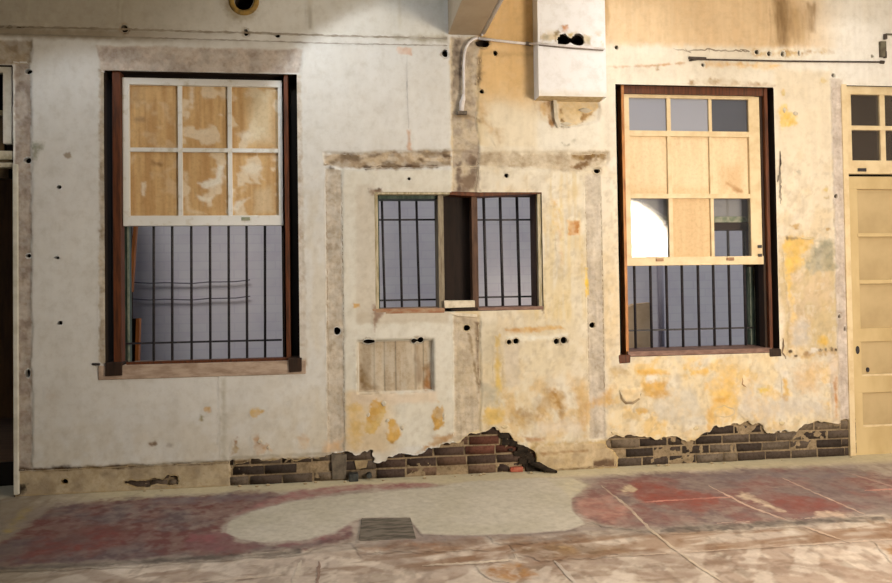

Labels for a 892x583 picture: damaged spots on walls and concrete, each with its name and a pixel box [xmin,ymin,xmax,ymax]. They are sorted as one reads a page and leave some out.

water stain [768,0,792,51]
water stain [804,0,818,35]
flaking render [750,46,837,60]
crack [775,151,783,204]
peeling [0,24,611,566]
flaking render [376,75,849,478]
peeling [572,463,892,533]